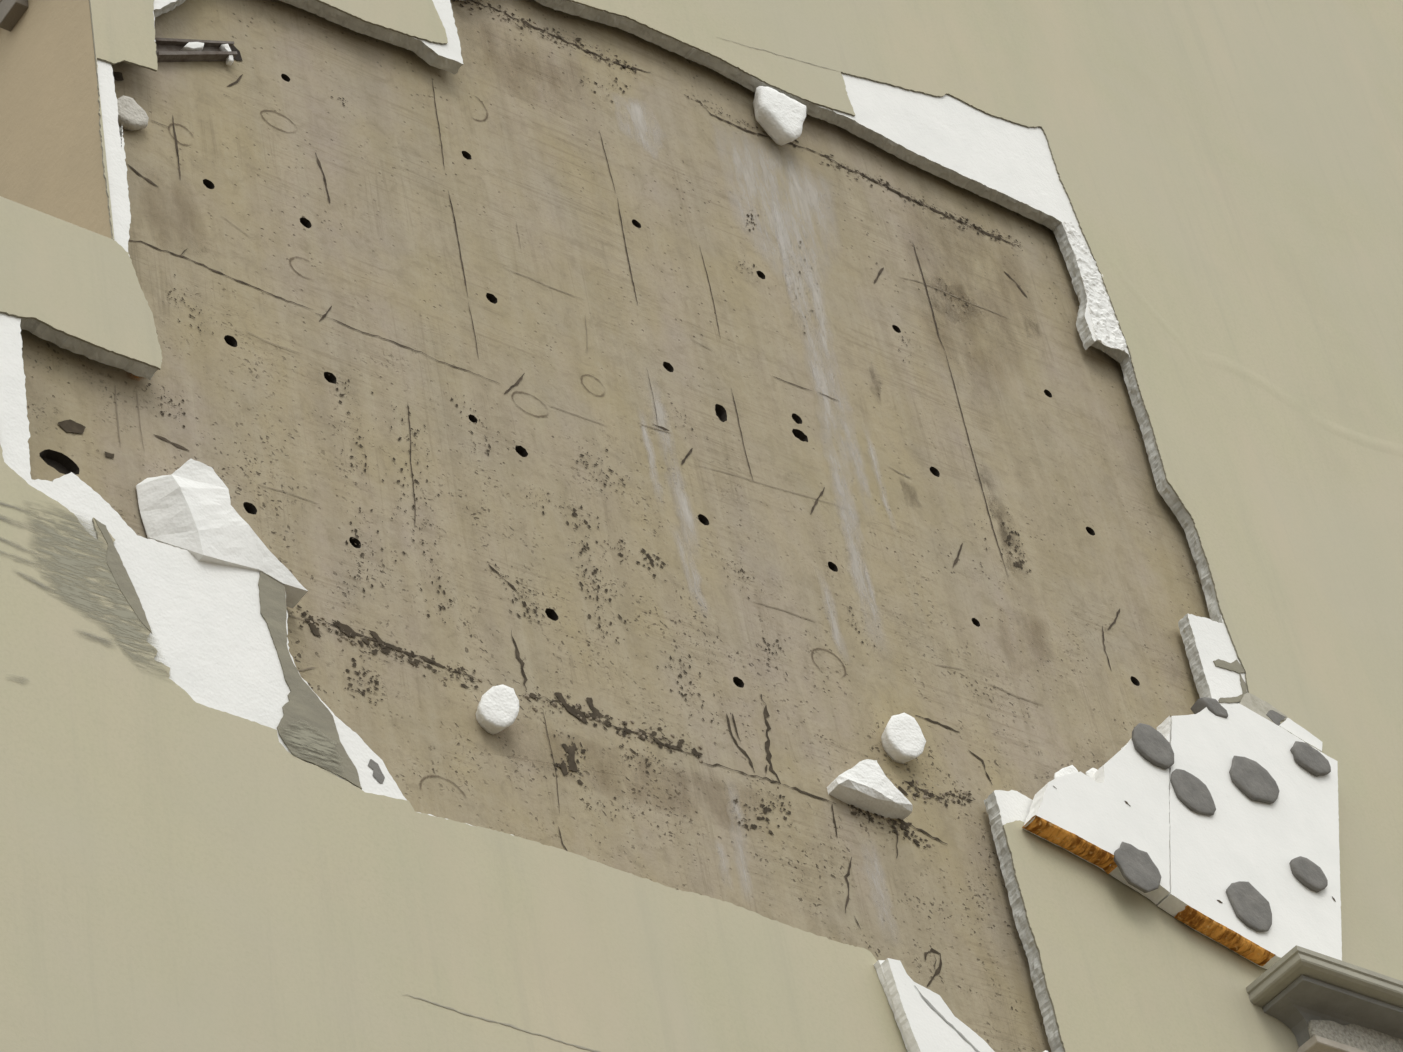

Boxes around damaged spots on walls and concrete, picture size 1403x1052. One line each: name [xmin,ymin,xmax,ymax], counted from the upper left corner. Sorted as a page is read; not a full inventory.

spalling [1063,222,1127,351]
spalling [58,419,86,433]
flaking render [32,512,159,665]
spalling [334,379,453,623]
spalling [521,446,668,644]
spalling [296,605,482,708]
flaking render [1213,659,1322,752]
spalling [368,759,385,784]
spalling [523,686,703,848]
spalling [848,804,931,849]
spalling [898,779,976,809]
crack [406,994,601,1052]